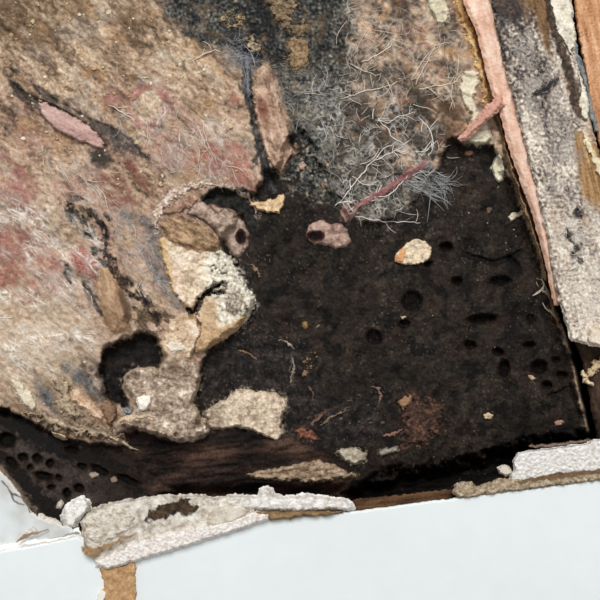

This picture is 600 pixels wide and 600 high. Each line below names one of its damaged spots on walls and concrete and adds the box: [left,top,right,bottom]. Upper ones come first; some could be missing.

leakage [159,0,460,228]
peeling [546,0,599,132]
spalling [50,65,600,498]
mould [566,228,584,263]
spalling [0,374,356,569]